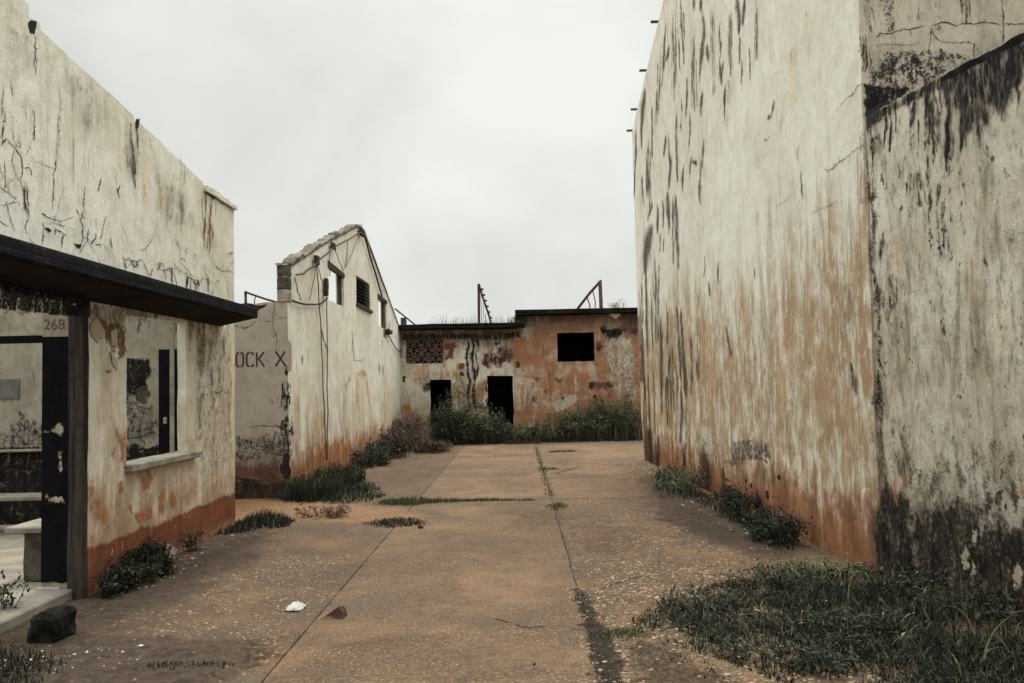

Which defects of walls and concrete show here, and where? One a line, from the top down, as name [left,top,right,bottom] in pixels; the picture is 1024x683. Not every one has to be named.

crack [876,0,1024,59]
crack [0,85,234,291]
crack [775,144,862,213]
peeling [89,308,126,356]
water stain [169,320,319,468]
peeling [481,341,521,369]
peeling [523,336,638,411]
water stain [587,0,802,560]
water stain [858,0,1024,628]
peeling [128,469,177,524]
crack [493,449,660,683]